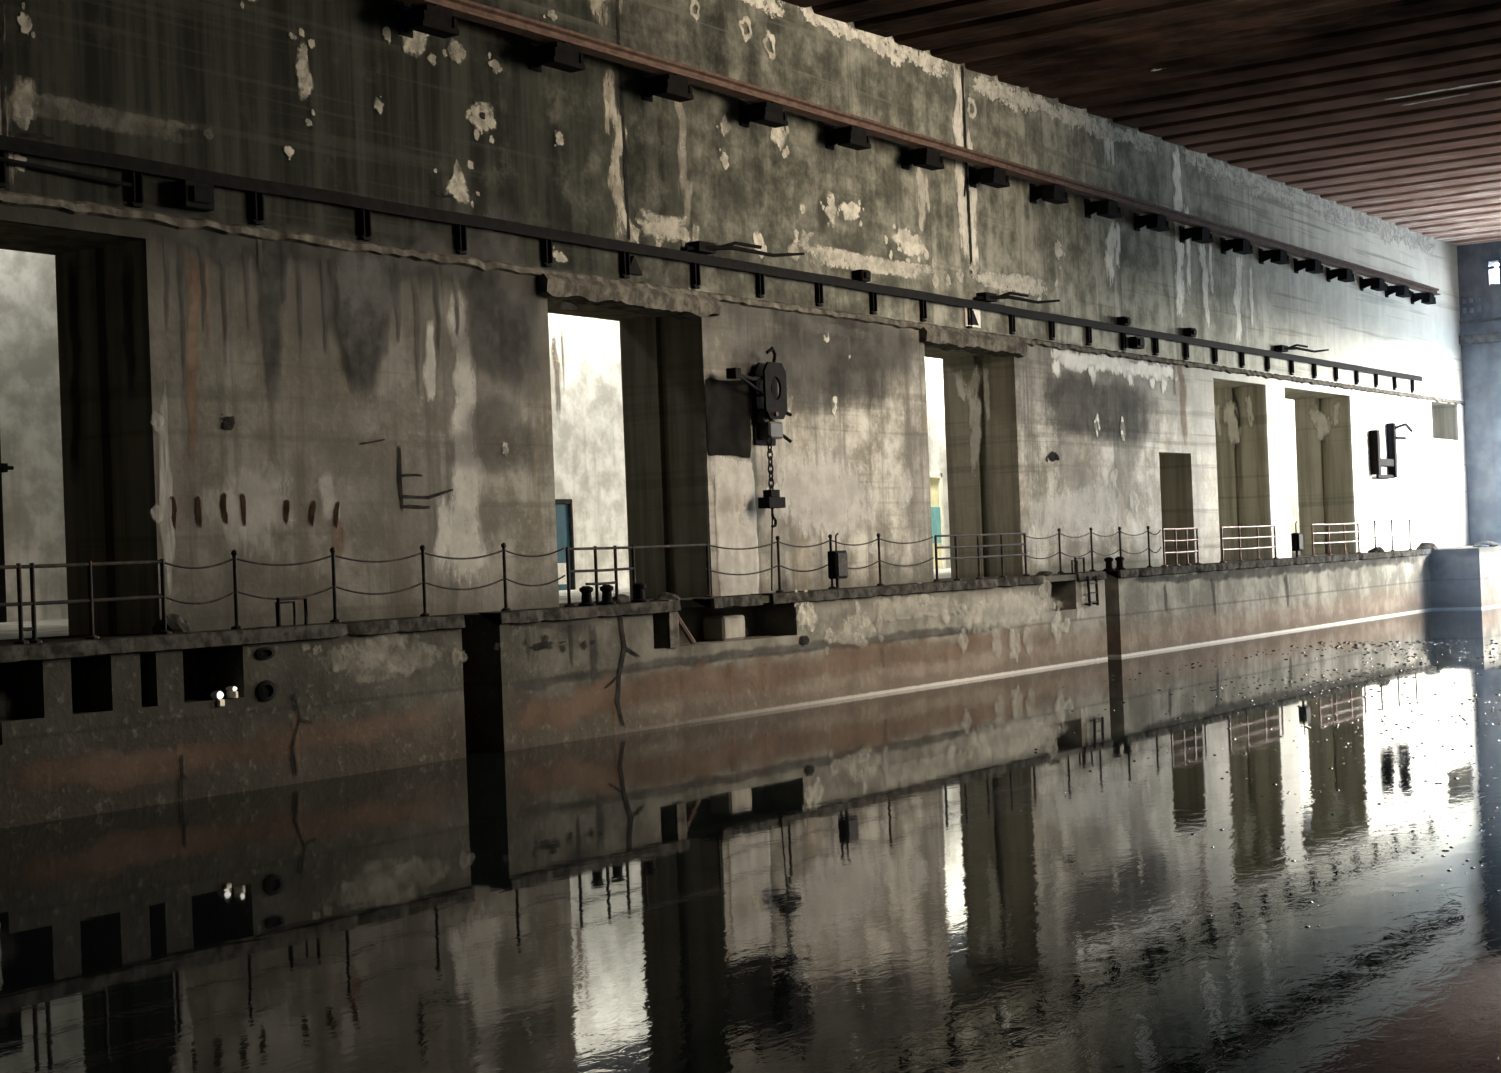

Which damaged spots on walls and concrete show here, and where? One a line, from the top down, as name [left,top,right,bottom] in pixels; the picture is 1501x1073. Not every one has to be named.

spalling [17,2,35,39]
spalling [289,28,315,126]
spalling [466,102,496,144]
spalling [430,159,480,207]
spalling [632,211,700,247]
damp [164,210,535,395]
damp [1049,379,1147,439]